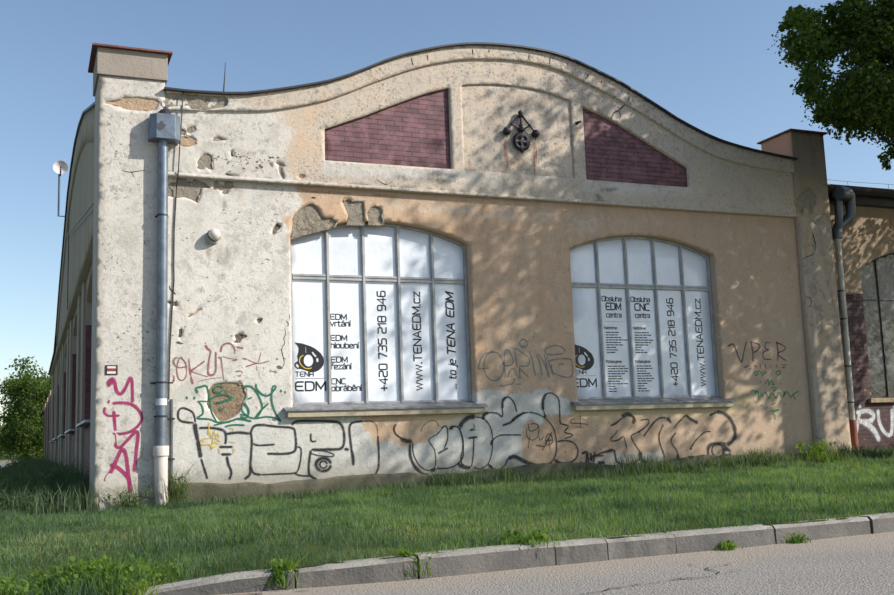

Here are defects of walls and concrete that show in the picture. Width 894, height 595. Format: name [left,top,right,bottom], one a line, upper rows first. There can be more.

spalling [106,93,228,111]
peeling [181,127,197,147]
spalling [168,150,284,203]
spalling [291,199,384,240]